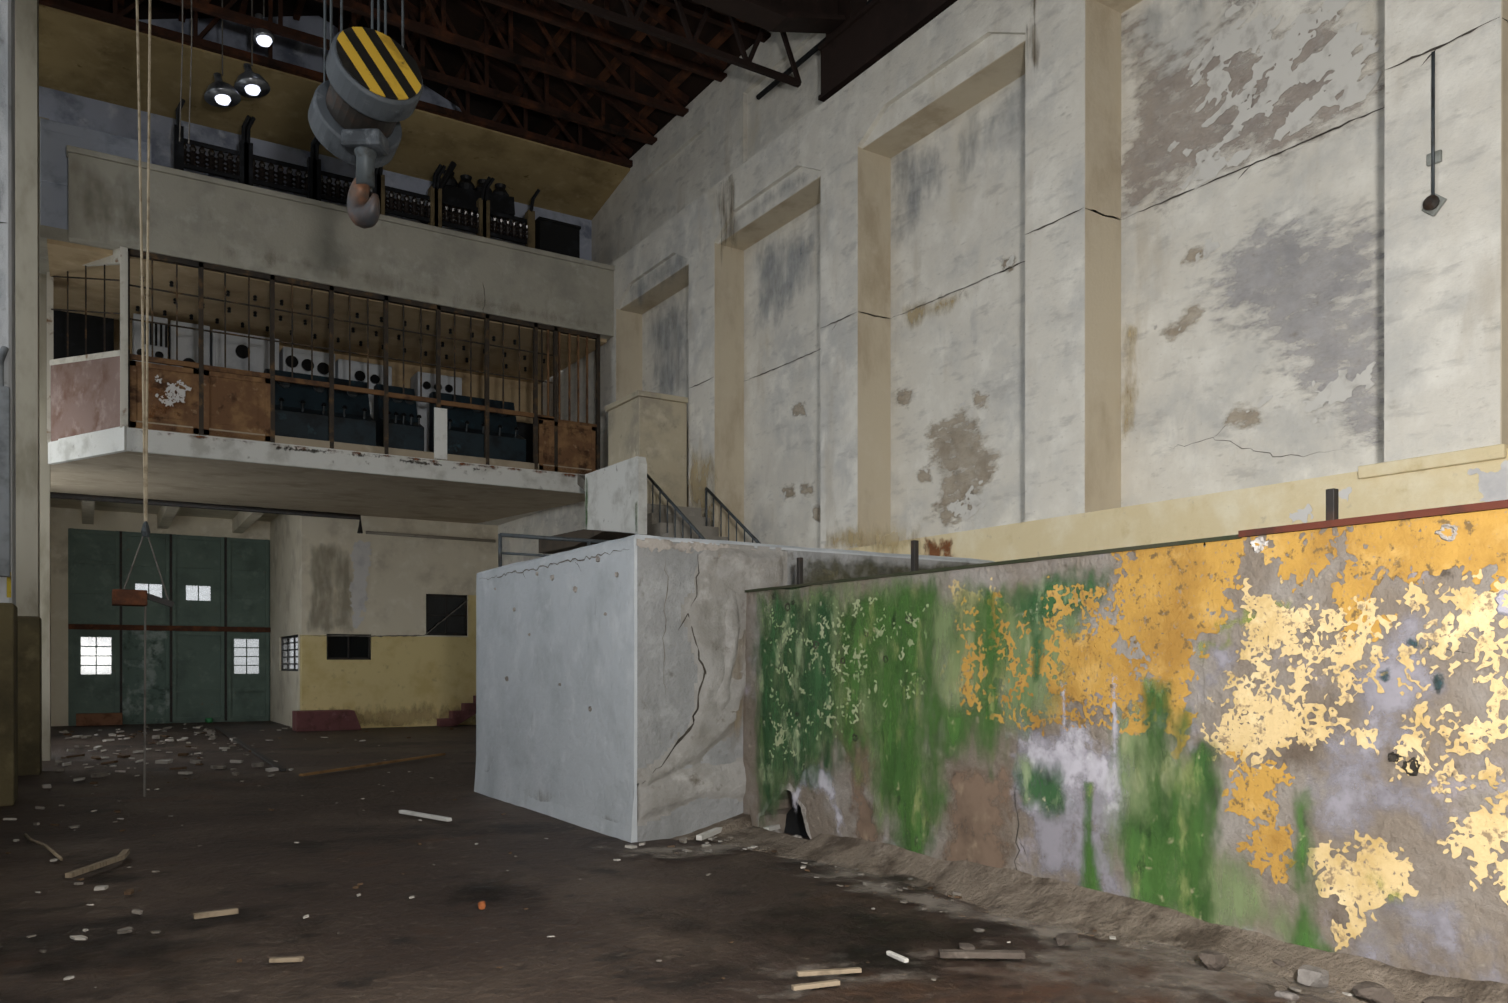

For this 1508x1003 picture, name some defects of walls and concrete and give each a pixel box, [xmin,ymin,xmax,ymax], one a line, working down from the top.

peeling [1121,0,1385,206]
peeling [918,394,1005,531]
leakage [1032,597,1041,680]
leakage [1144,679,1187,748]
peeling [942,460,1508,952]
leakage [1014,677,1128,894]
leakage [1151,743,1217,906]
spalling [1199,949,1229,971]
spalling [1272,959,1329,1001]